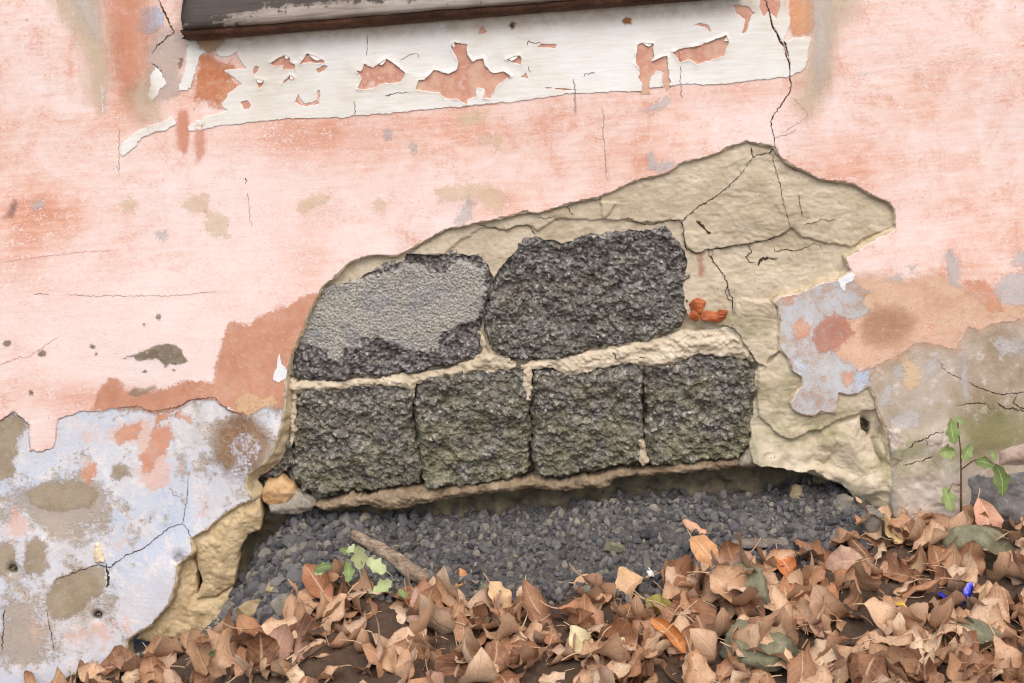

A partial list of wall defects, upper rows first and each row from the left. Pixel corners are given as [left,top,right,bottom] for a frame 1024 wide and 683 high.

peeling [733,0,780,33]
peeling [148,68,166,101]
peeling [178,40,208,91]
peeling [271,54,327,83]
peeling [357,59,405,90]
peeling [416,42,528,107]
peeling [636,23,729,112]
crack [627,0,837,310]
flaking render [0,141,1024,683]
crack [941,363,1024,412]
crack [903,431,945,466]
crack [52,470,190,588]